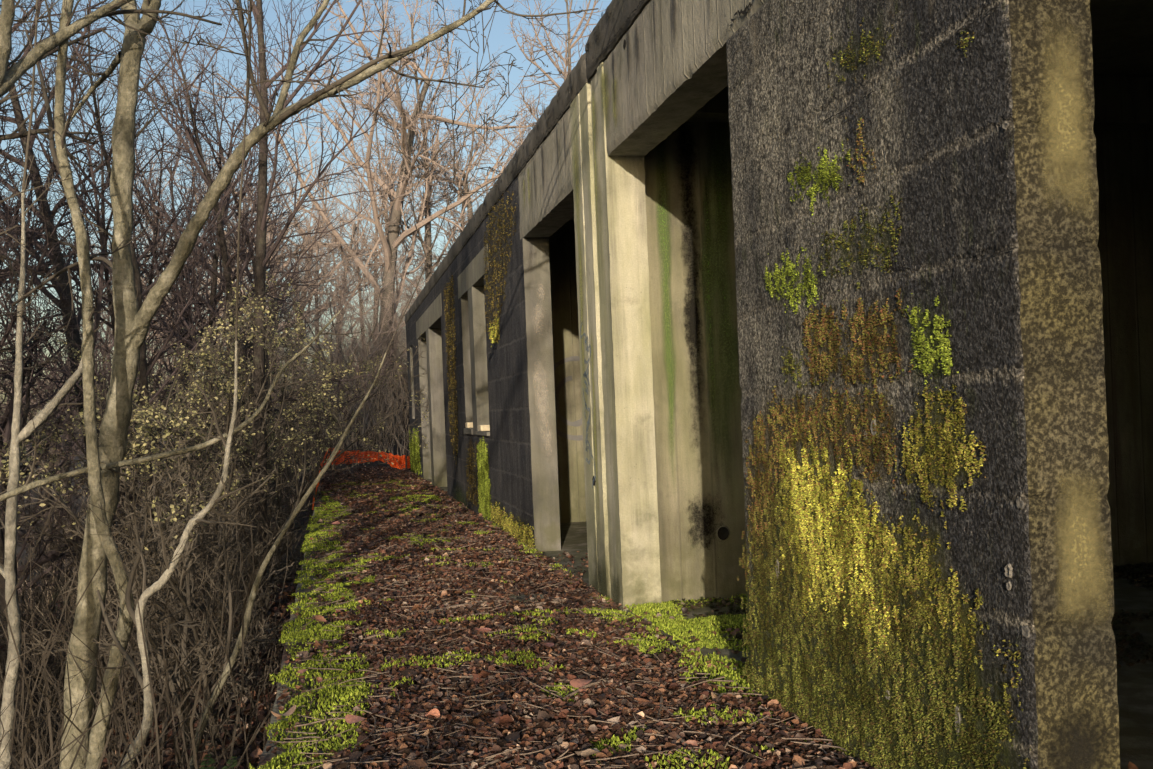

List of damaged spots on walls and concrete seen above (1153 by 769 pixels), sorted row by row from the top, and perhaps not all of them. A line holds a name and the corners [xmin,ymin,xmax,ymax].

damp [592,28,638,229]
damp [657,126,737,440]
damp [688,503,720,548]